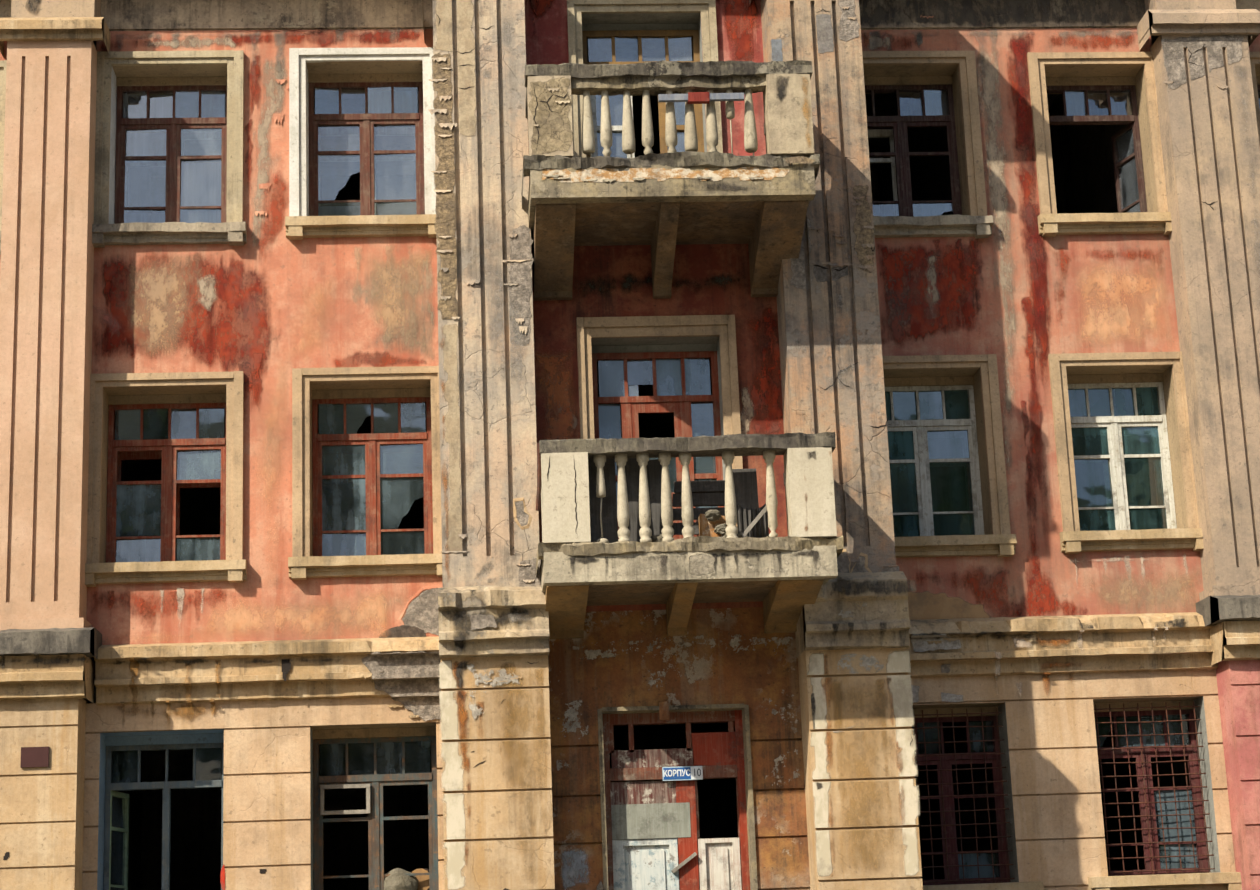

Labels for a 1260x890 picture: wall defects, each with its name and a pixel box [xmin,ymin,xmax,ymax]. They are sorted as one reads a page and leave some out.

flaking render [542,156,815,183]
flaking render [428,53,480,568]
flaking render [492,225,534,378]
spalling [515,558,541,587]
flaking render [359,585,443,721]
flaking render [572,634,794,660]
flaking render [466,662,522,720]
flaking render [558,700,589,739]
water stain [807,568,1035,876]
flaking render [765,748,800,786]